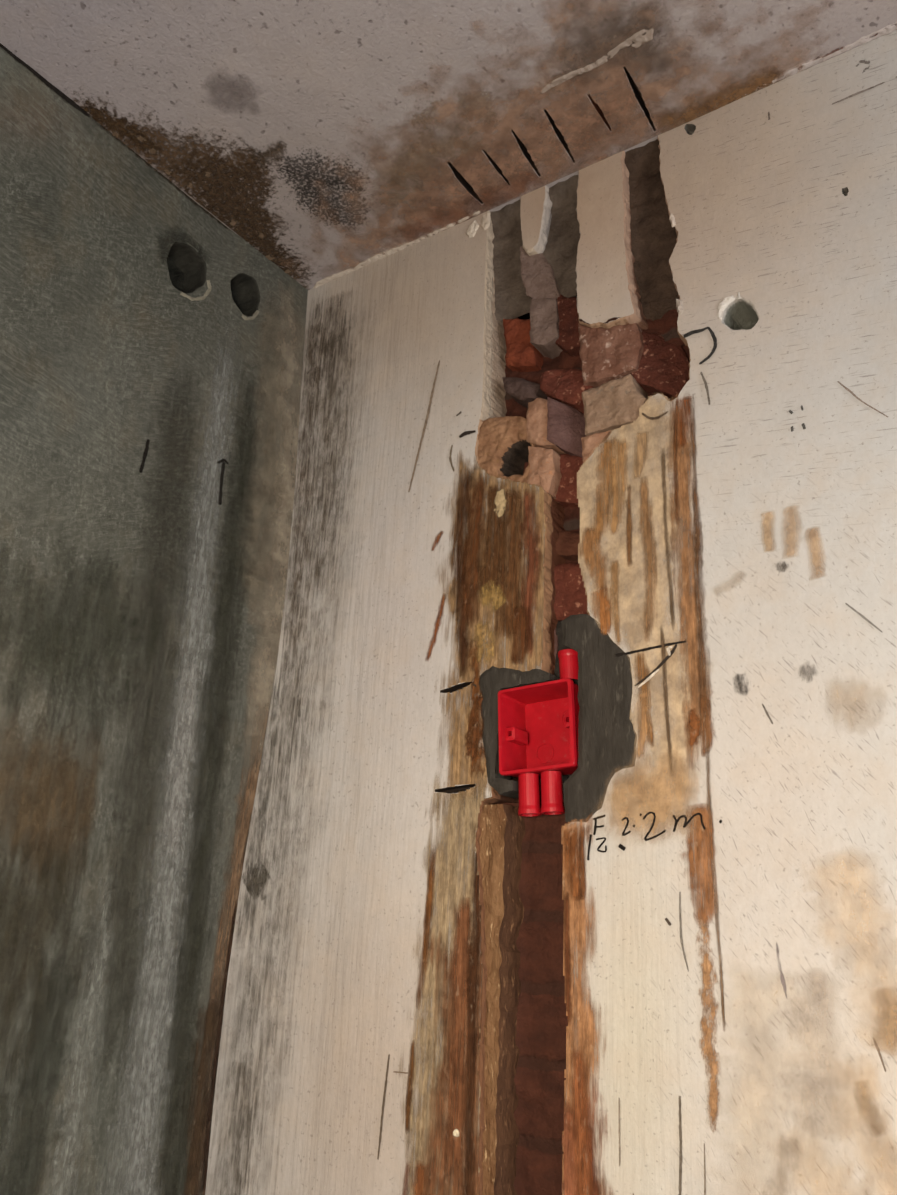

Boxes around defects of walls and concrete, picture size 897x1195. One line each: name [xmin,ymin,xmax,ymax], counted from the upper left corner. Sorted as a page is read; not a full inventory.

mould [74,91,316,288]
peeling [180,280,212,301]
damp [338,0,801,270]
spalling [475,246,691,508]
peeling [539,25,659,95]
peeling [717,292,742,320]
damp [0,302,347,1195]
corrosion [403,456,546,1195]
corrosion [577,397,725,1127]
corrosion [561,819,606,1195]